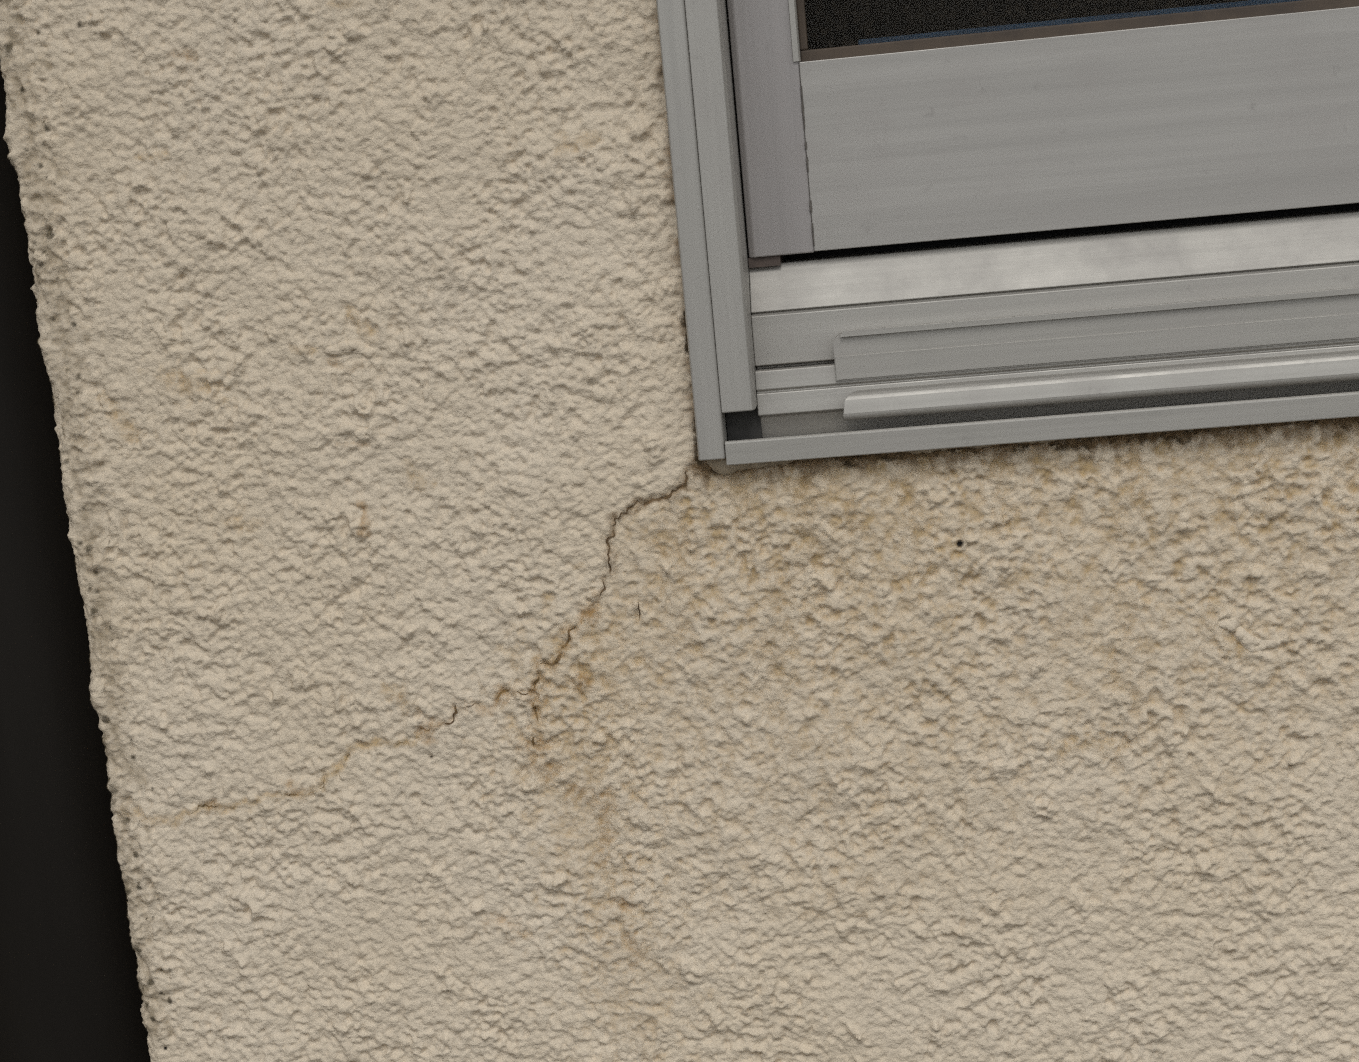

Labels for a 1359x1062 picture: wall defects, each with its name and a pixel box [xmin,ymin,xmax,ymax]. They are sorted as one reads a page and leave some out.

crack [399,465,695,746]